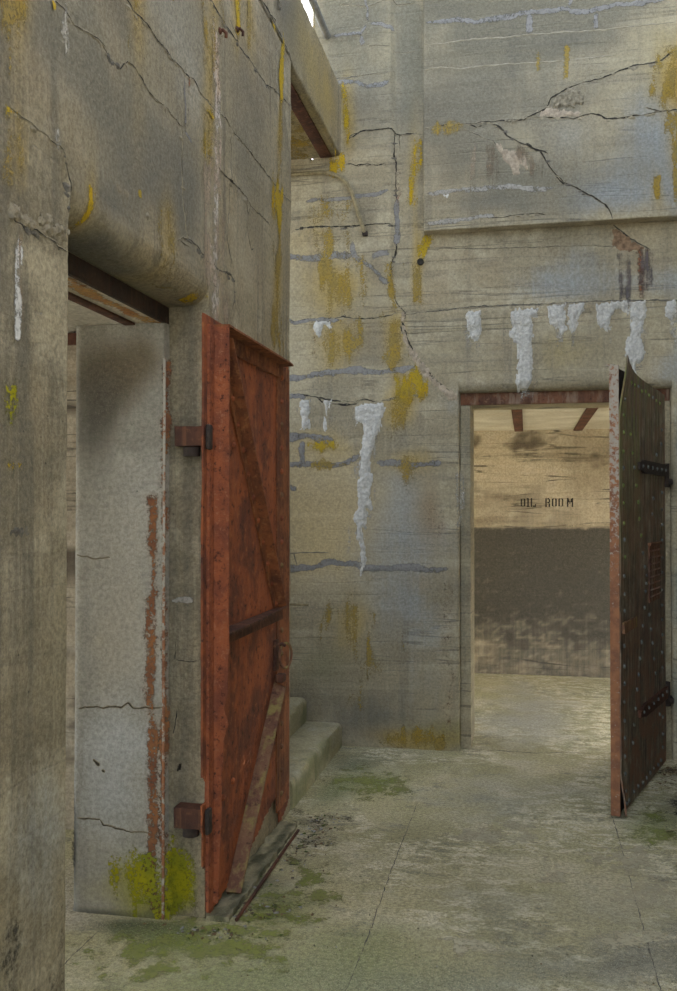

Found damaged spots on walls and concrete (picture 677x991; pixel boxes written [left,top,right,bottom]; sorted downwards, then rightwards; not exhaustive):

water stain [15,240,23,341]
crack [12,218,67,252]
crack [10,107,72,212]
crack [50,0,291,310]
water stain [465,310,482,342]
crack [290,22,677,406]
water stain [503,250,653,398]
water stain [651,111,677,205]
water stain [348,402,386,576]
rust [143,360,172,914]